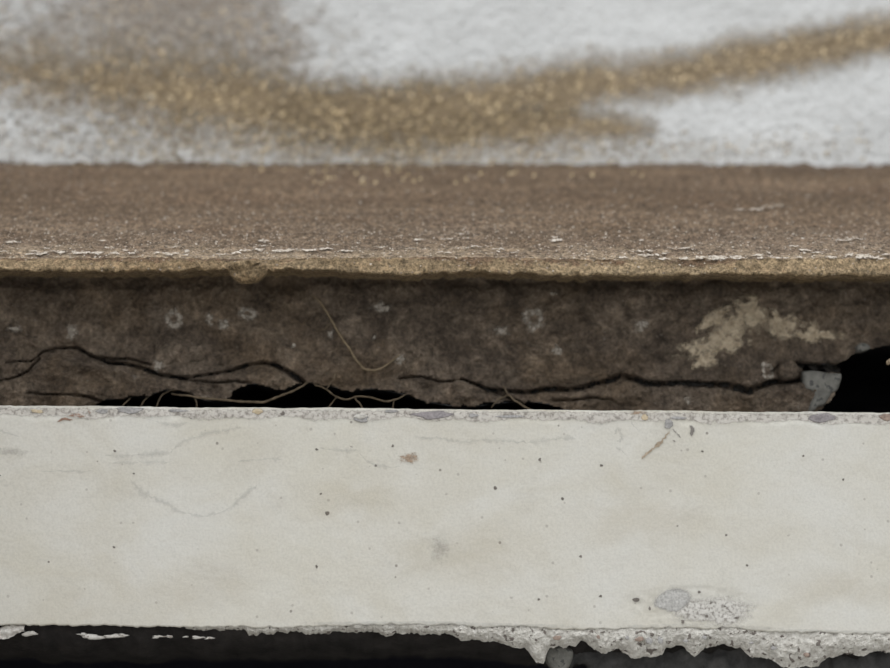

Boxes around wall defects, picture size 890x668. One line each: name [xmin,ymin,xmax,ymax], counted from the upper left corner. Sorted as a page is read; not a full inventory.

crack [5,347,304,422]
crack [412,362,841,406]
hole [802,346,890,413]
flaking render [0,625,38,639]
spalling [153,589,890,668]